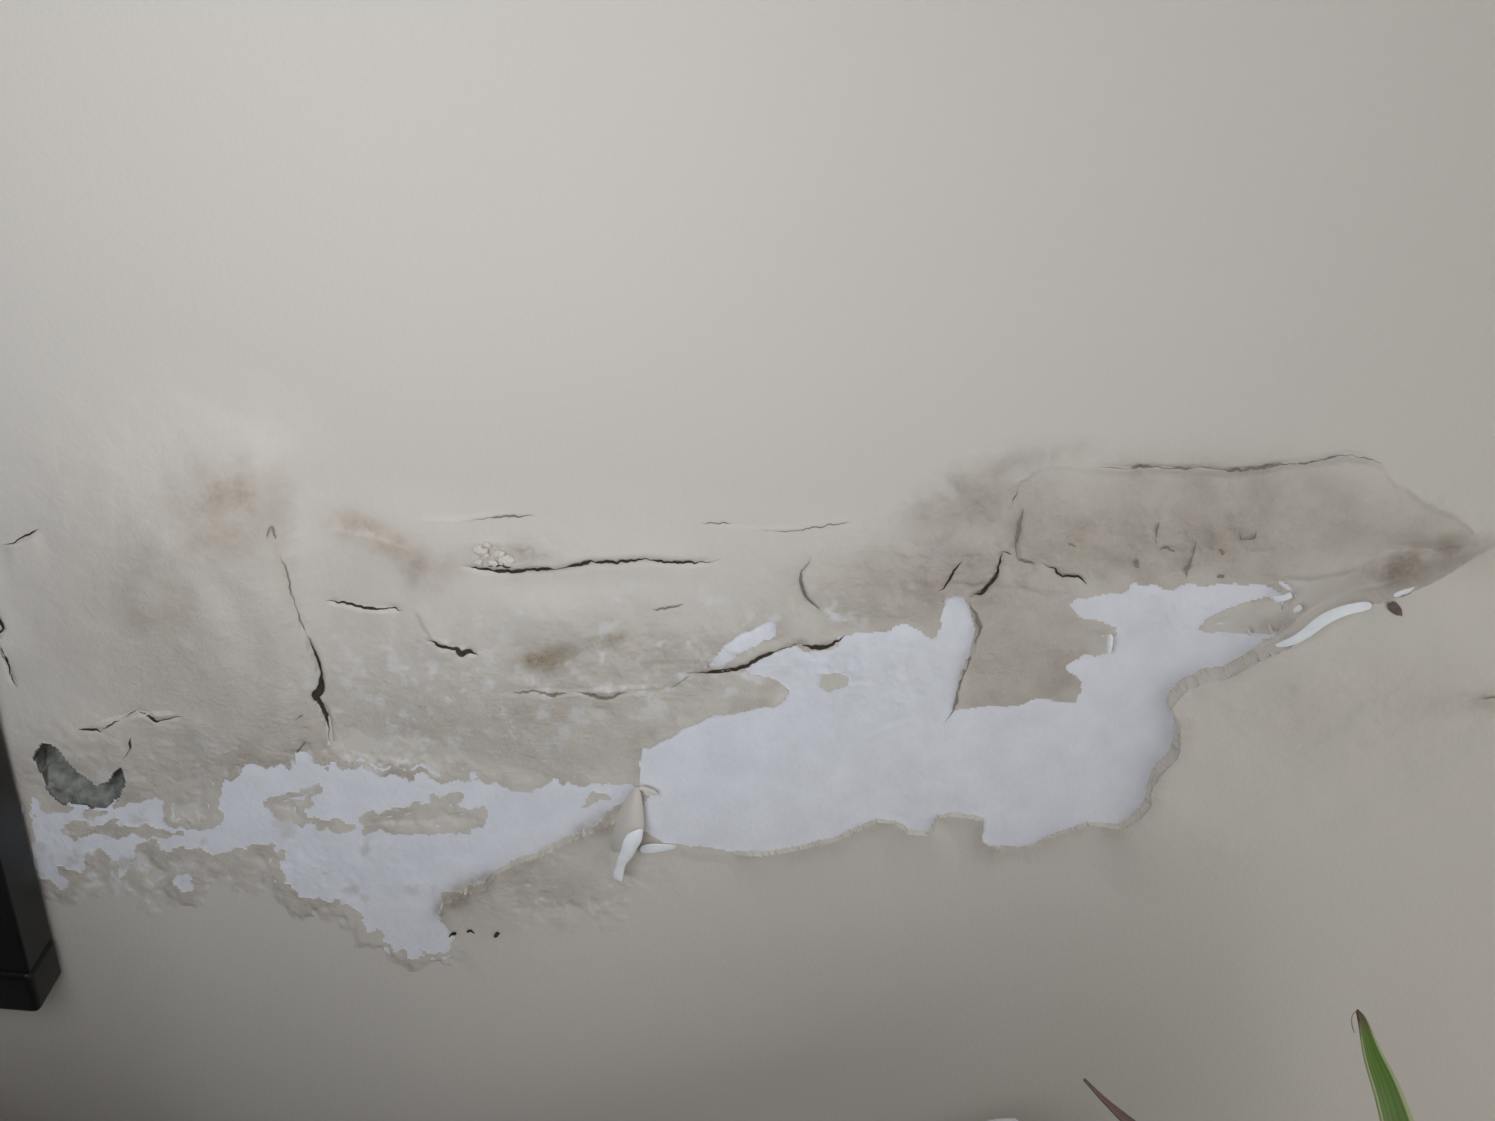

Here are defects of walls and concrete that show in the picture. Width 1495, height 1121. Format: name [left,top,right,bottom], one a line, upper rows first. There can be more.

crack [475,513,529,521]
peeling [473,542,516,567]
crack [471,522,847,687]
crack [0,620,17,686]
crack [266,526,402,753]
crack [427,640,479,657]
crack [513,690,624,700]
flaking render [20,548,1495,996]